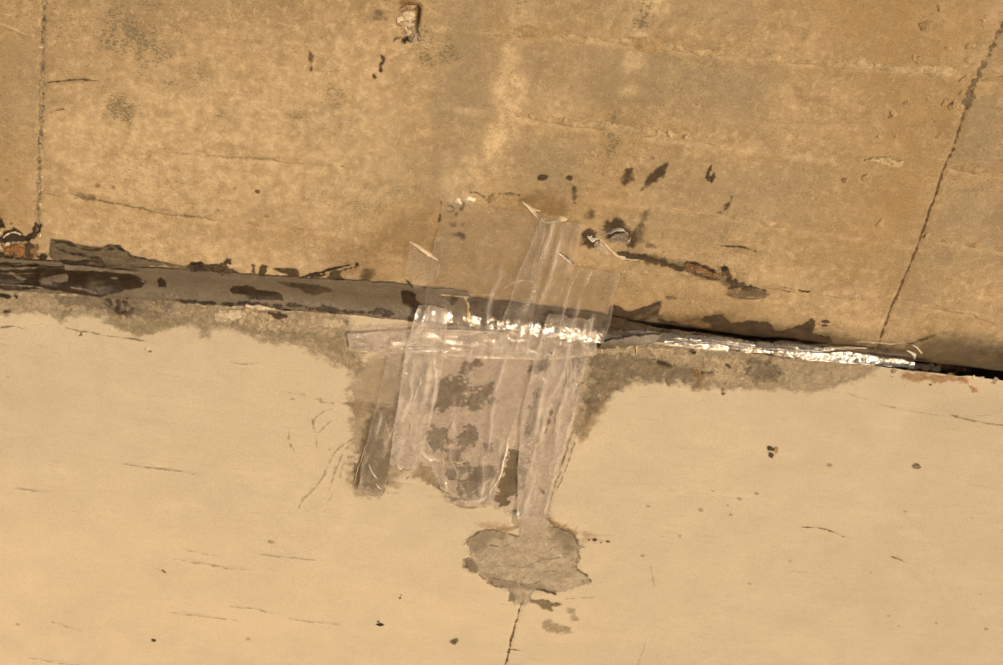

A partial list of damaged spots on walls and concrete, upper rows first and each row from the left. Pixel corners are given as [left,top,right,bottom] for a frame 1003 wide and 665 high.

spalling [393,1,422,44]
crack [35,0,48,236]
crack [874,23,1003,353]
peeling [50,241,188,270]
damp [607,296,832,344]
spalling [463,513,610,605]
crack [505,602,522,664]